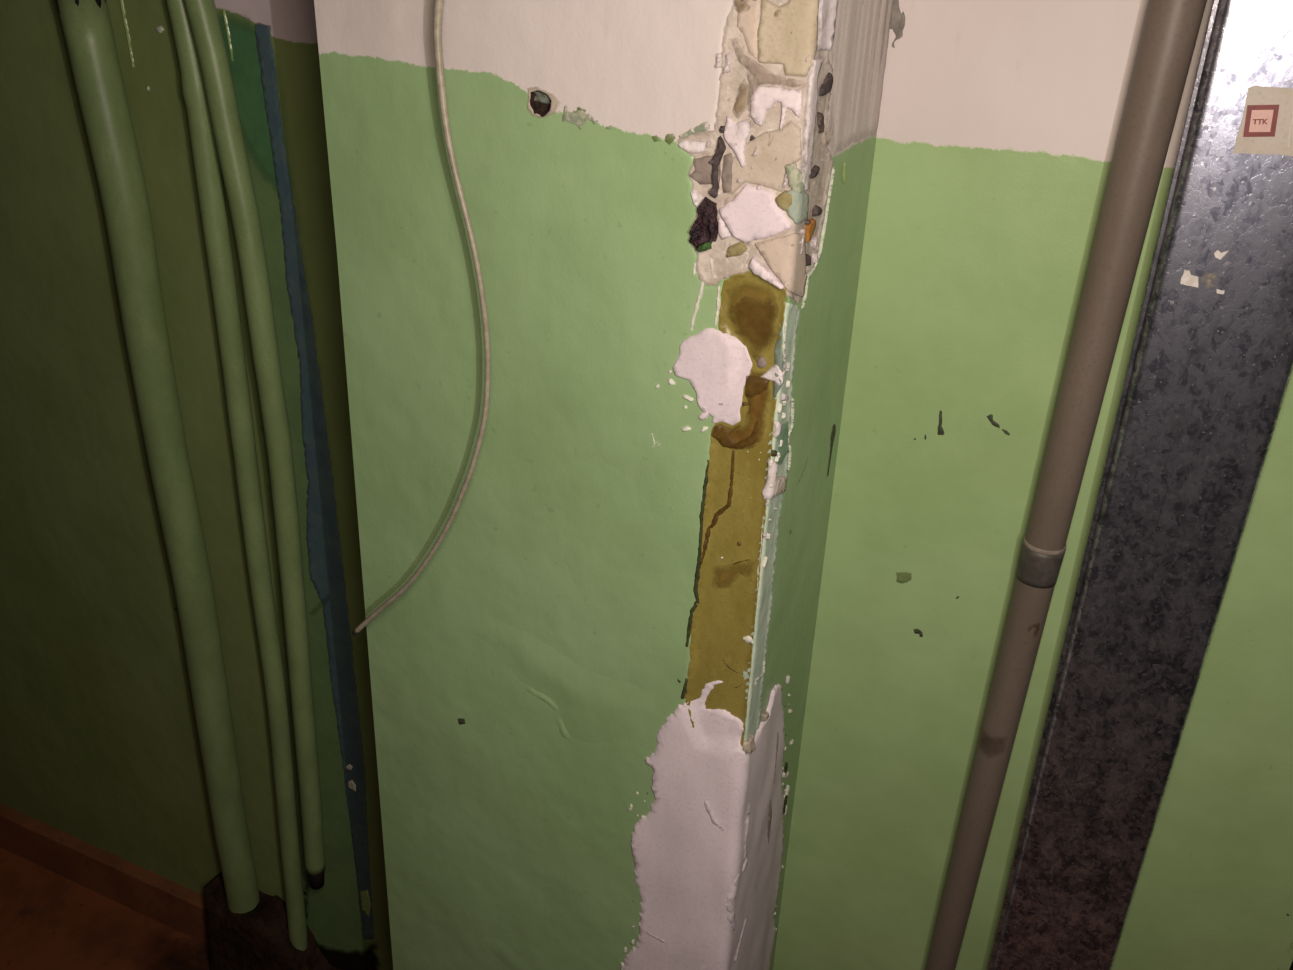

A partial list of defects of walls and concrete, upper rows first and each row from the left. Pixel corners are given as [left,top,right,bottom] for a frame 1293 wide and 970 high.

spalling [527,87,612,129]
flaking render [652,0,838,753]
crack [700,450,735,564]